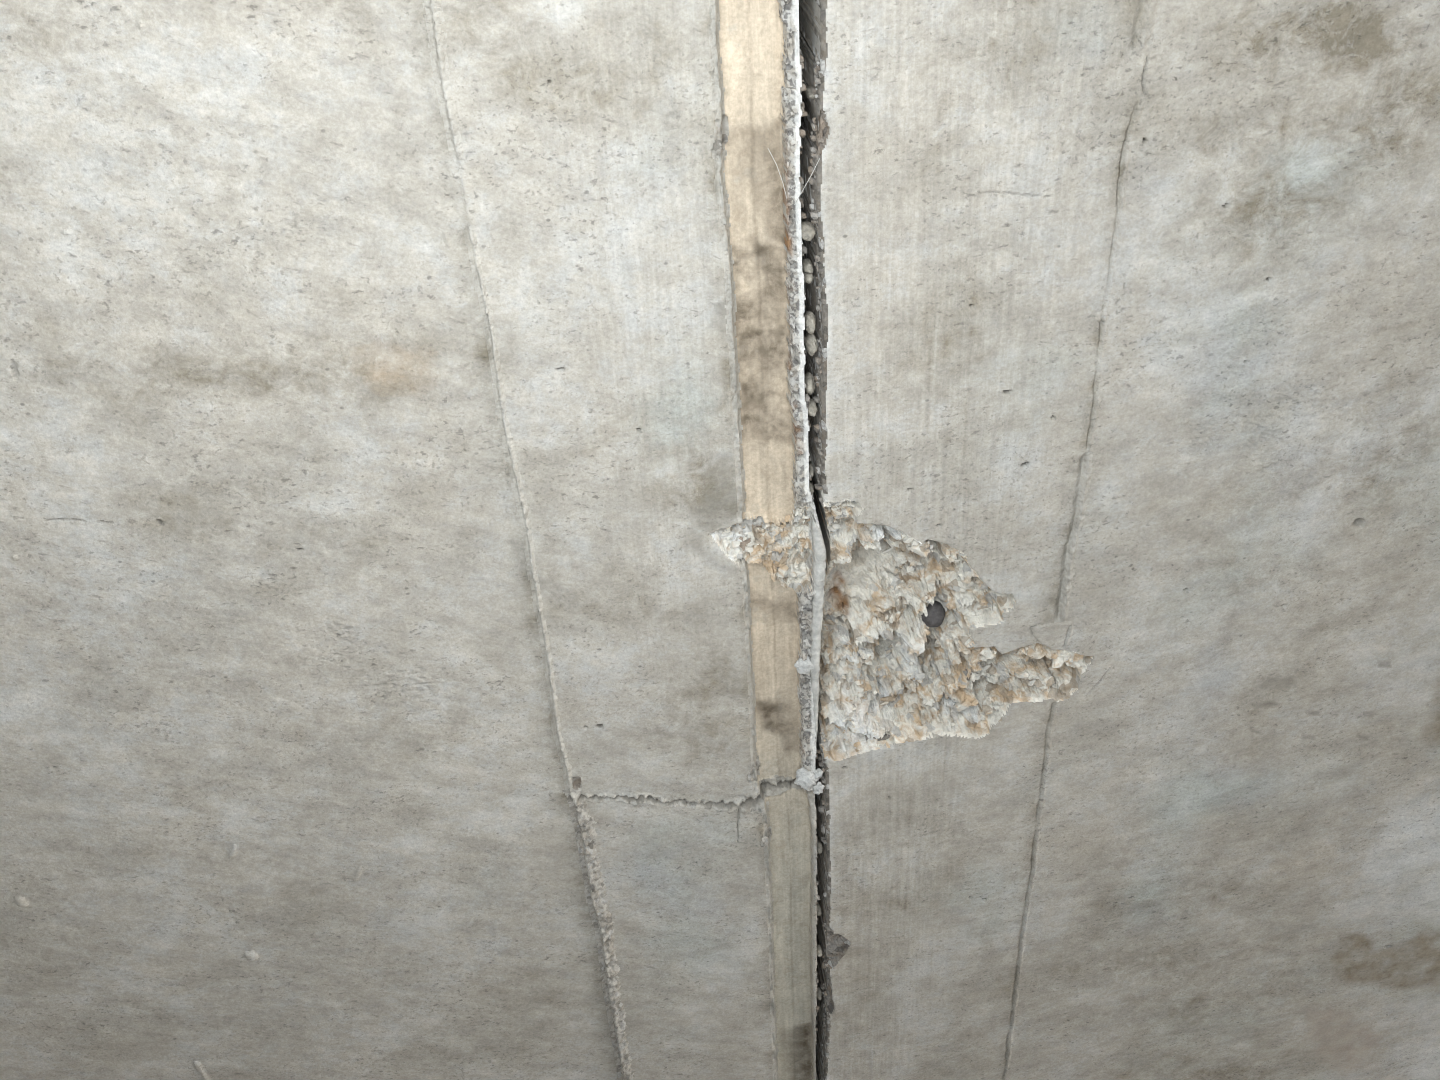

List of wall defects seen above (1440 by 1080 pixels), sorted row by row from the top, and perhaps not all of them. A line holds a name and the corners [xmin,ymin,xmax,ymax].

crack [1139,55,1152,99]
spalling [709,0,1093,1080]
water stain [1409,668,1440,750]
crack [573,775,815,847]
water stain [1328,925,1440,992]